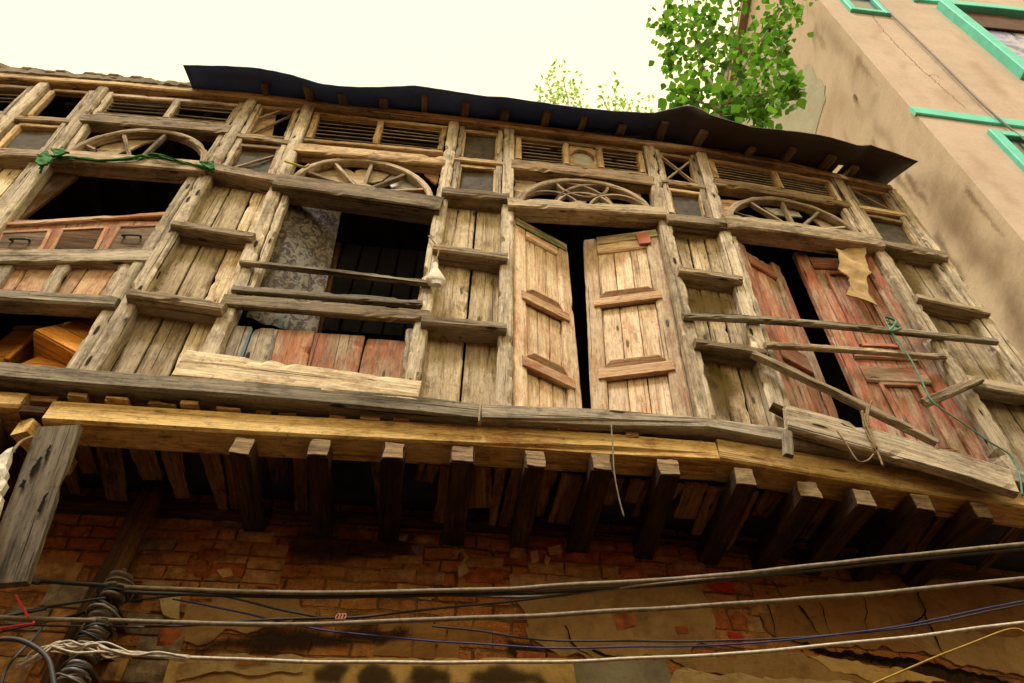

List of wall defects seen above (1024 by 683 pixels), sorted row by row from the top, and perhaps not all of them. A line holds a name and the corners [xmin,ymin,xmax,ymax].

flaking render [100,518,303,683]
spalling [614,613,637,631]
crack [767,581,830,639]
crack [911,591,946,659]